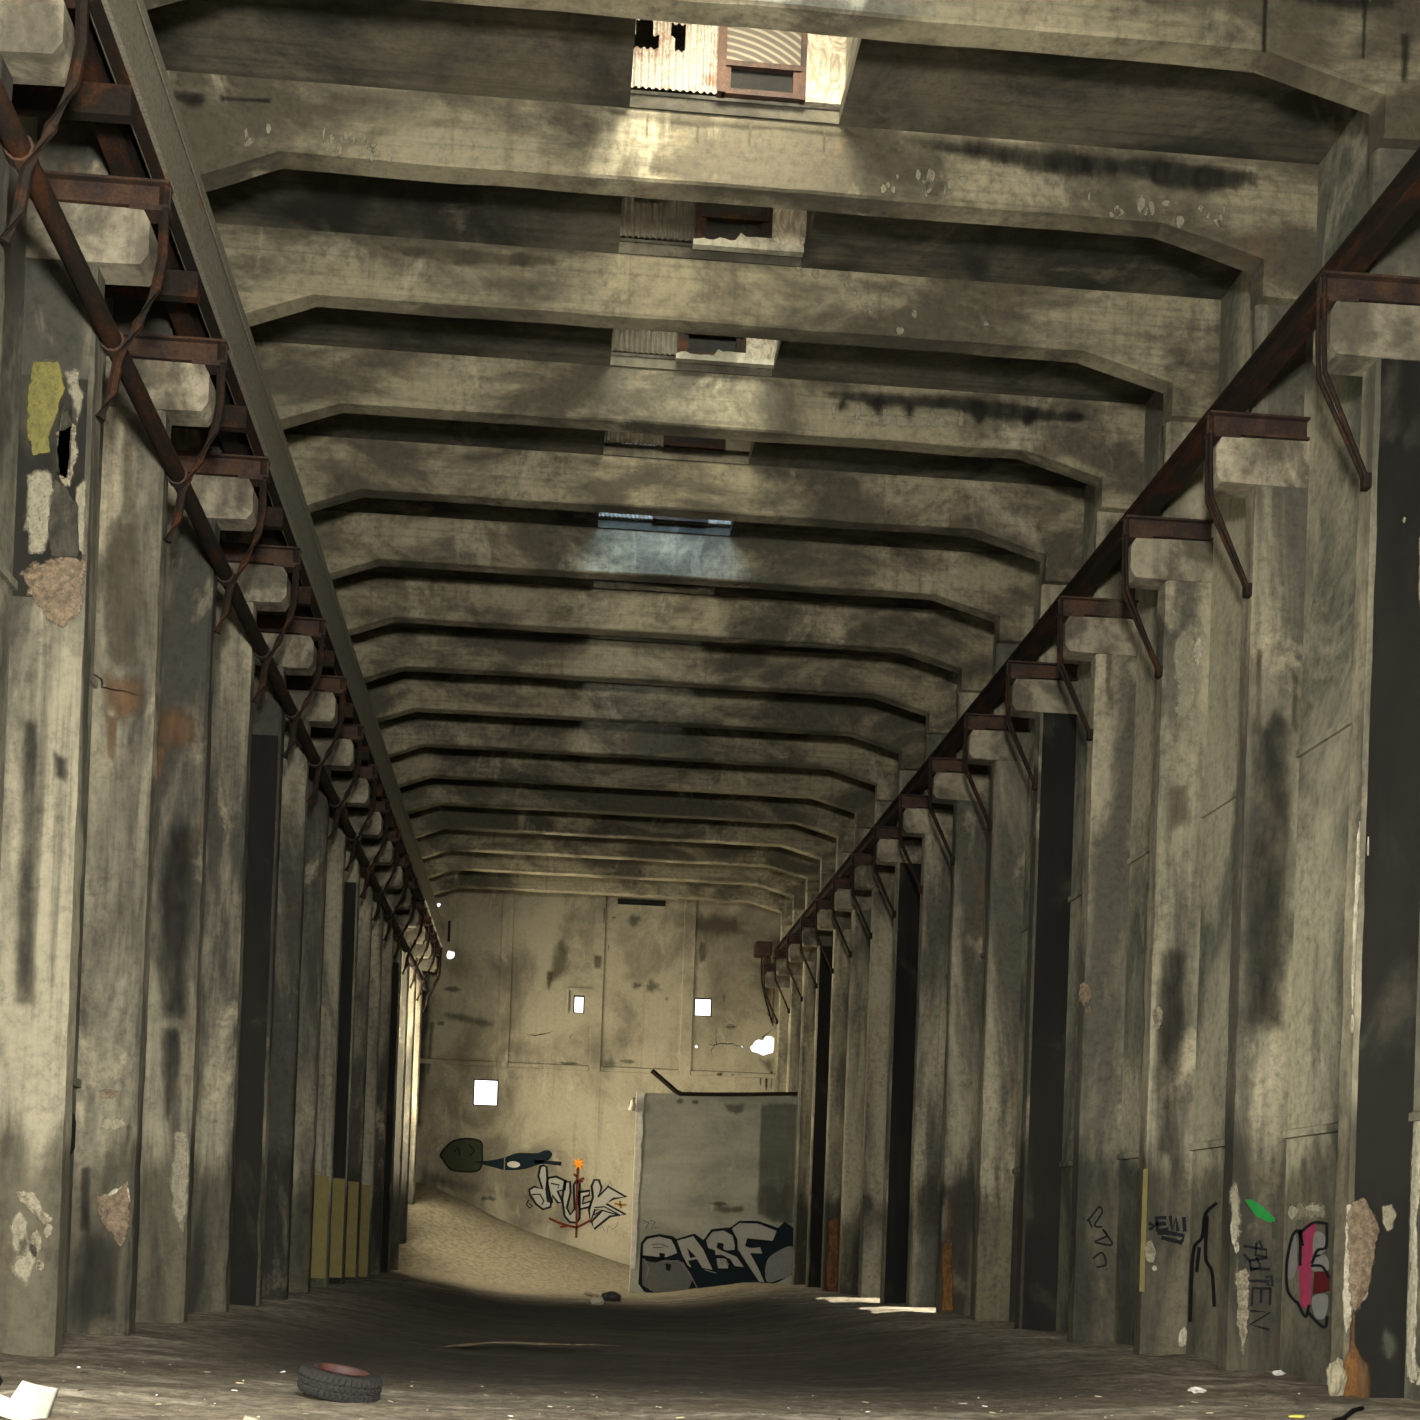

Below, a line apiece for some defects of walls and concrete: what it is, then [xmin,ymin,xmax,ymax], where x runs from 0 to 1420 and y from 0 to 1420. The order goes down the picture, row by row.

spalling [27,361,86,558]
spalling [11,1191,53,1282]
spalling [96,1181,130,1246]
peeling [1230,1183,1241,1253]
peeling [1288,1201,1325,1220]
spalling [1342,1121,1420,1385]
peeling [1235,1268,1250,1348]